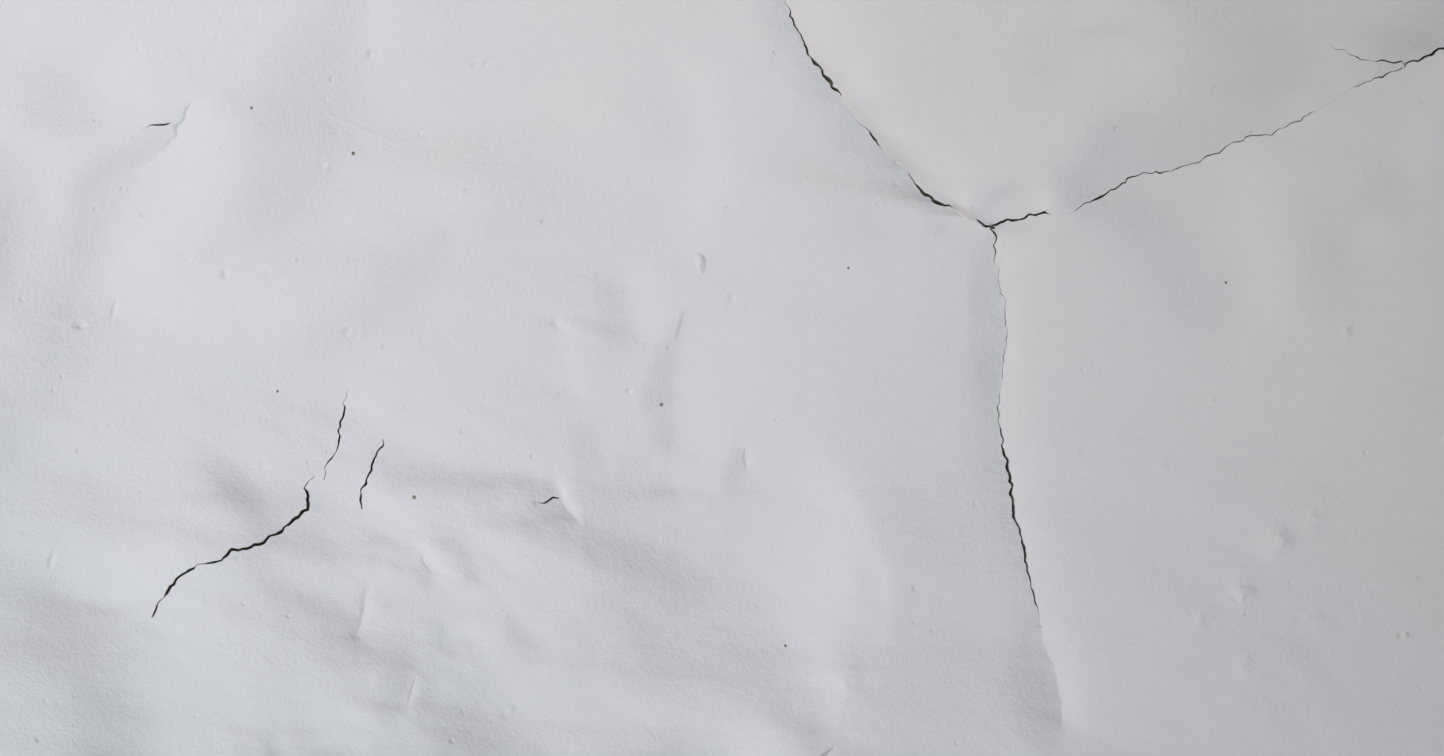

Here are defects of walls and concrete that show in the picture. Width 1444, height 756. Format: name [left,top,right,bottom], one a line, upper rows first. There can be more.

crack [141,117,174,135]
crack [777,0,1444,626]
crack [146,388,390,621]